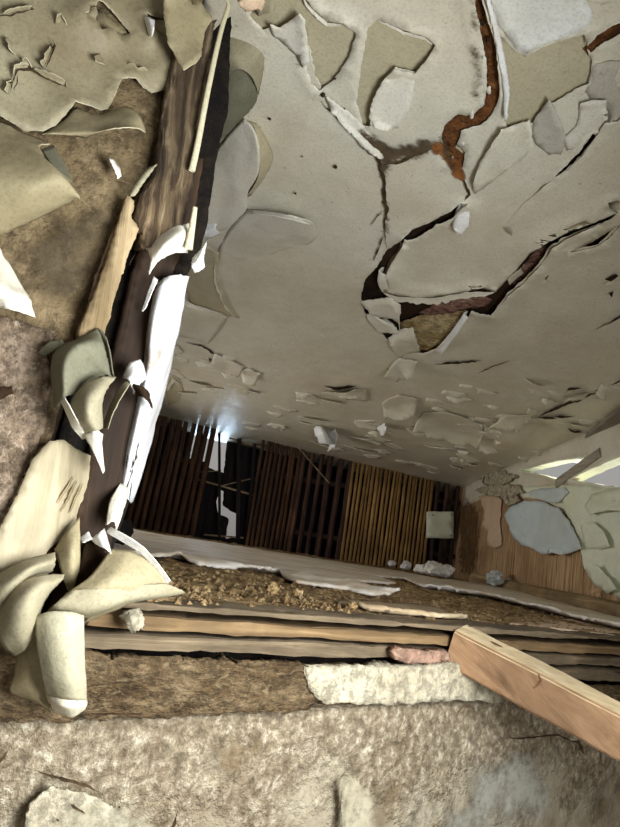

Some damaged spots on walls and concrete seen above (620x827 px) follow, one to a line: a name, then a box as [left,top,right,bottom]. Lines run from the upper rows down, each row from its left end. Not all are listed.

peeling [0,0,213,235]
peeling [237,0,275,16]
peeling [270,0,342,90]
crack [321,96,433,260]
peeling [369,67,415,132]
corrosion [432,0,500,181]
peeling [473,0,620,236]
corrosion [583,23,620,55]
peeling [0,37,318,718]
peeling [360,204,620,382]
flaking render [242,378,620,599]